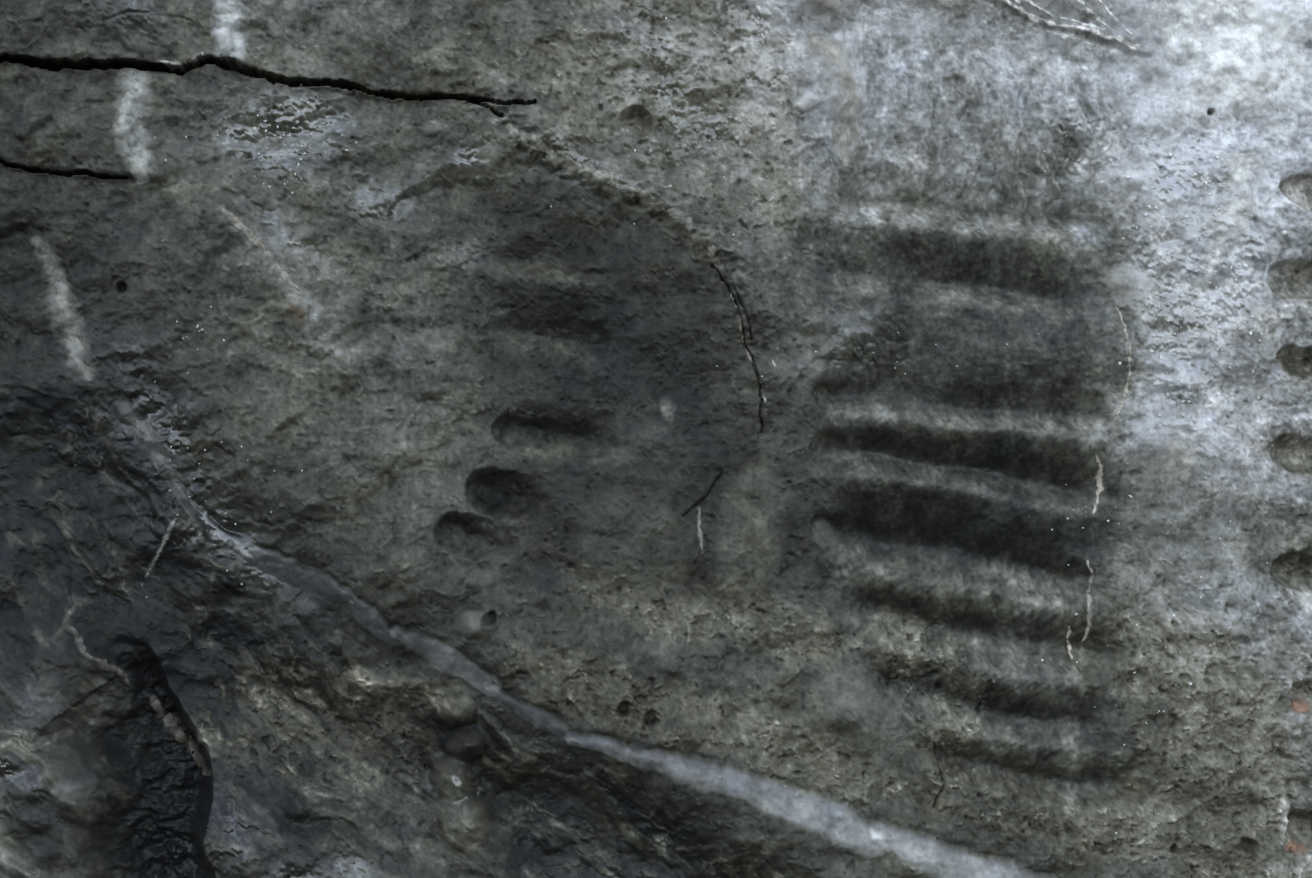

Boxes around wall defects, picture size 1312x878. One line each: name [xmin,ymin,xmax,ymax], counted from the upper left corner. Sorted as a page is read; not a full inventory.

crack [0,10,538,118]
crack [0,159,130,180]
crack [711,266,776,434]